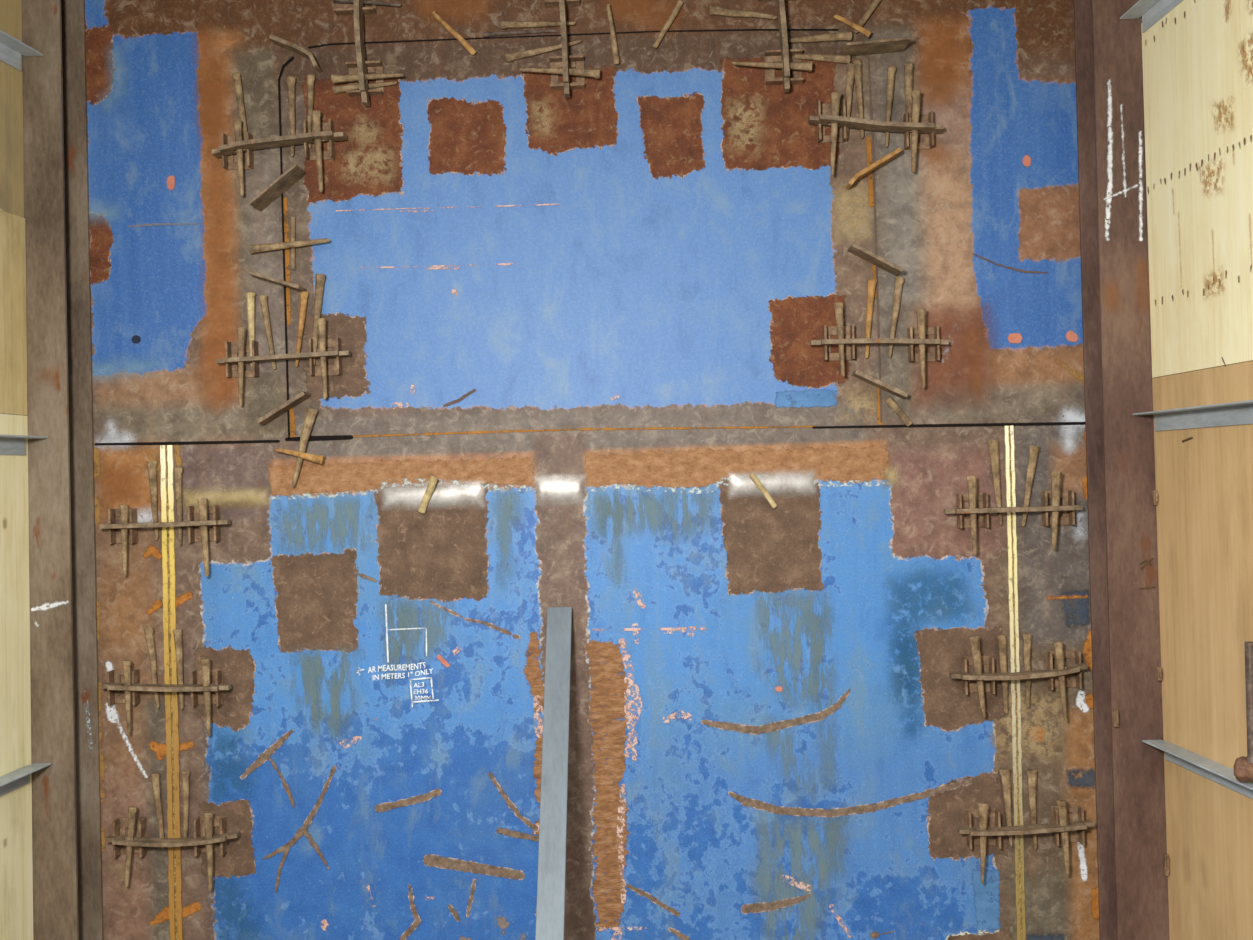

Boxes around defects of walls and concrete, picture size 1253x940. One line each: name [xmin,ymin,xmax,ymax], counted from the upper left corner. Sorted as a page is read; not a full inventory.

rust [584,623,646,932]